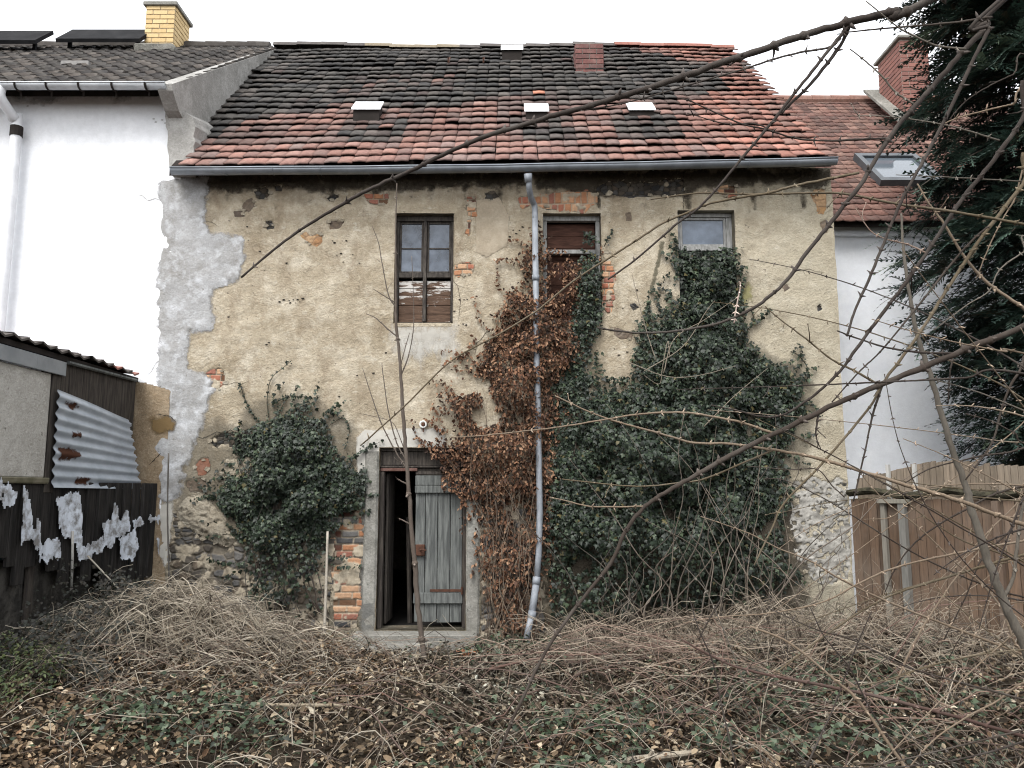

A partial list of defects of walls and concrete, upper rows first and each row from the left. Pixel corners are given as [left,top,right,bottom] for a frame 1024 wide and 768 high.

flaking render [364,193,389,206]
flaking render [518,179,684,214]
spalling [300,218,360,264]
flaking render [454,262,474,277]
flaking render [601,250,639,364]
flaking render [206,369,228,390]
rust [58,431,82,461]
peeling [126,382,364,631]
spalling [790,477,851,585]